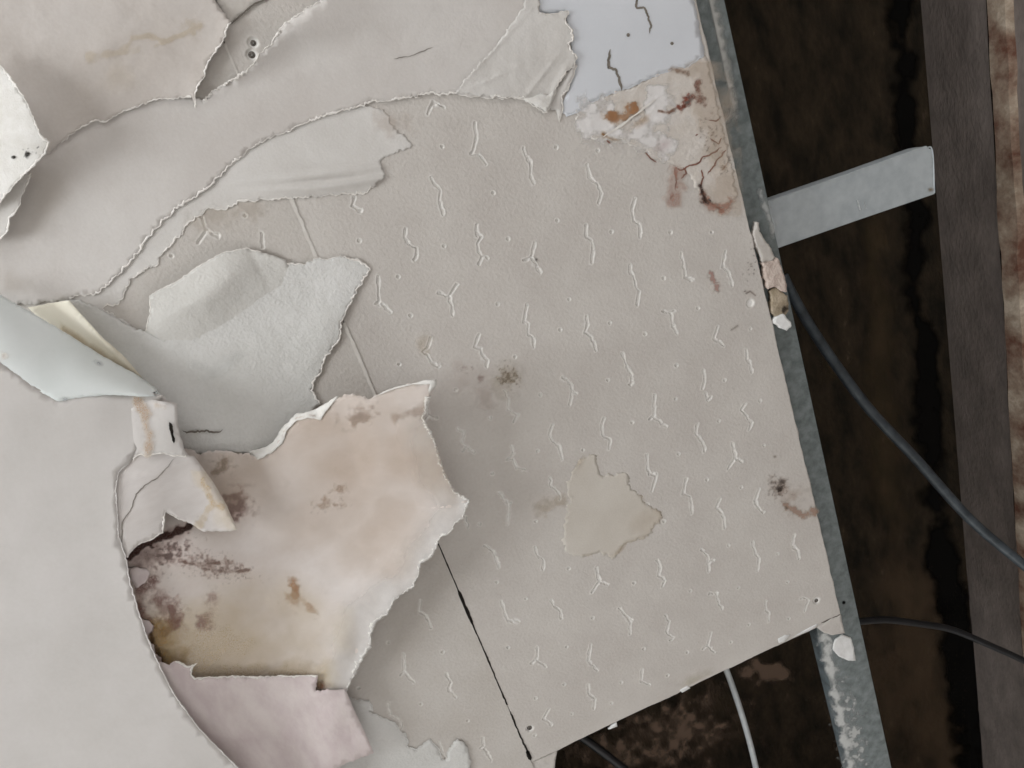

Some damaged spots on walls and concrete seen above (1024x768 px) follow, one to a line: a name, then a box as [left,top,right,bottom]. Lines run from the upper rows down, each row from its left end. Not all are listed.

corrosion [605,101,639,123]
peeling [524,55,738,208]
crack [607,0,674,91]
corrosion [658,68,706,114]
crack [646,118,726,210]
corrosion [700,192,732,214]
water stain [223,492,245,521]
water stain [126,523,250,665]
crack [438,543,532,760]